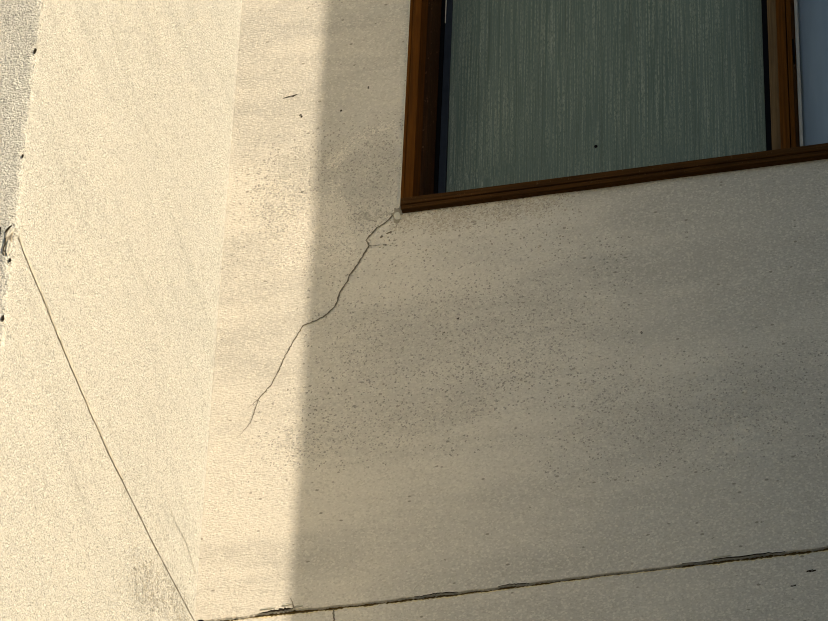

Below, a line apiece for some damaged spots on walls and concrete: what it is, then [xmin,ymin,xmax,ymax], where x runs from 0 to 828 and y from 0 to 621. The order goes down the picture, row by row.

spalling [2,225,15,262]
crack [243,208,399,431]